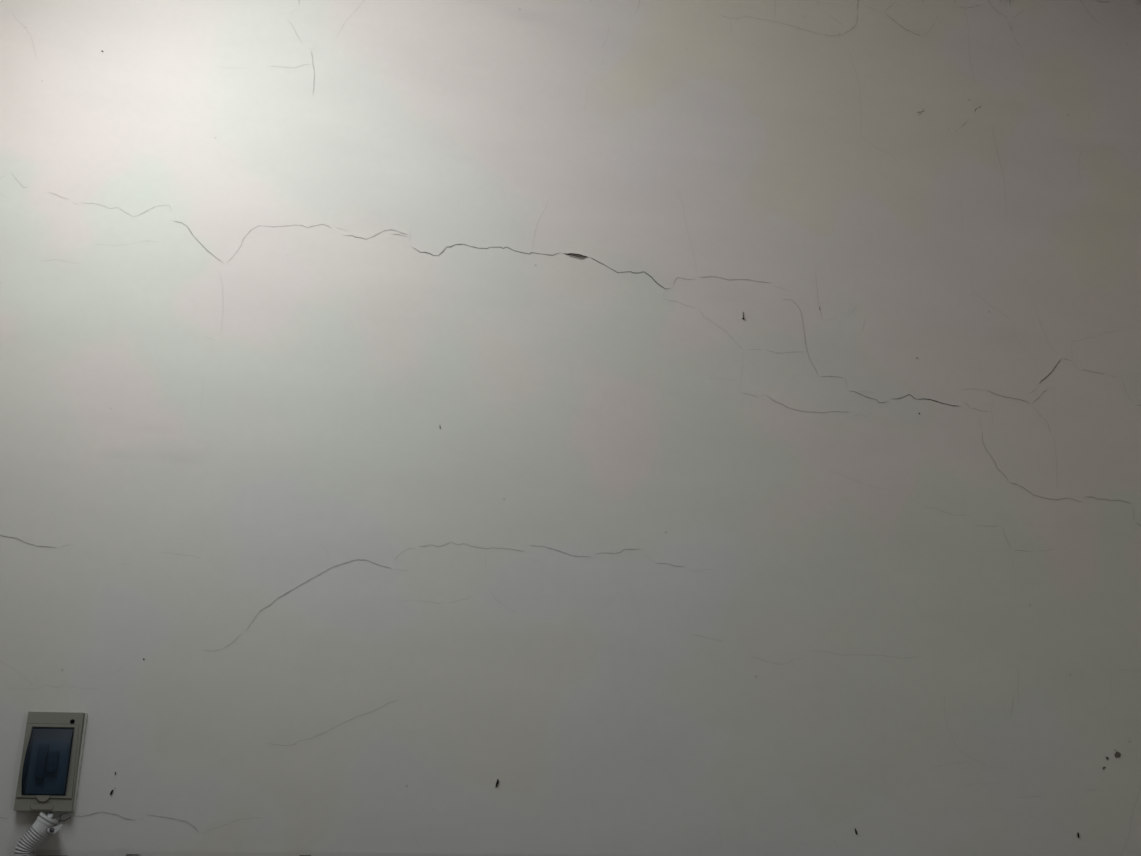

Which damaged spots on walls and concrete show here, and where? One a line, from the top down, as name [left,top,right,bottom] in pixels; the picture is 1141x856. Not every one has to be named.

crack [416,244,557,256]